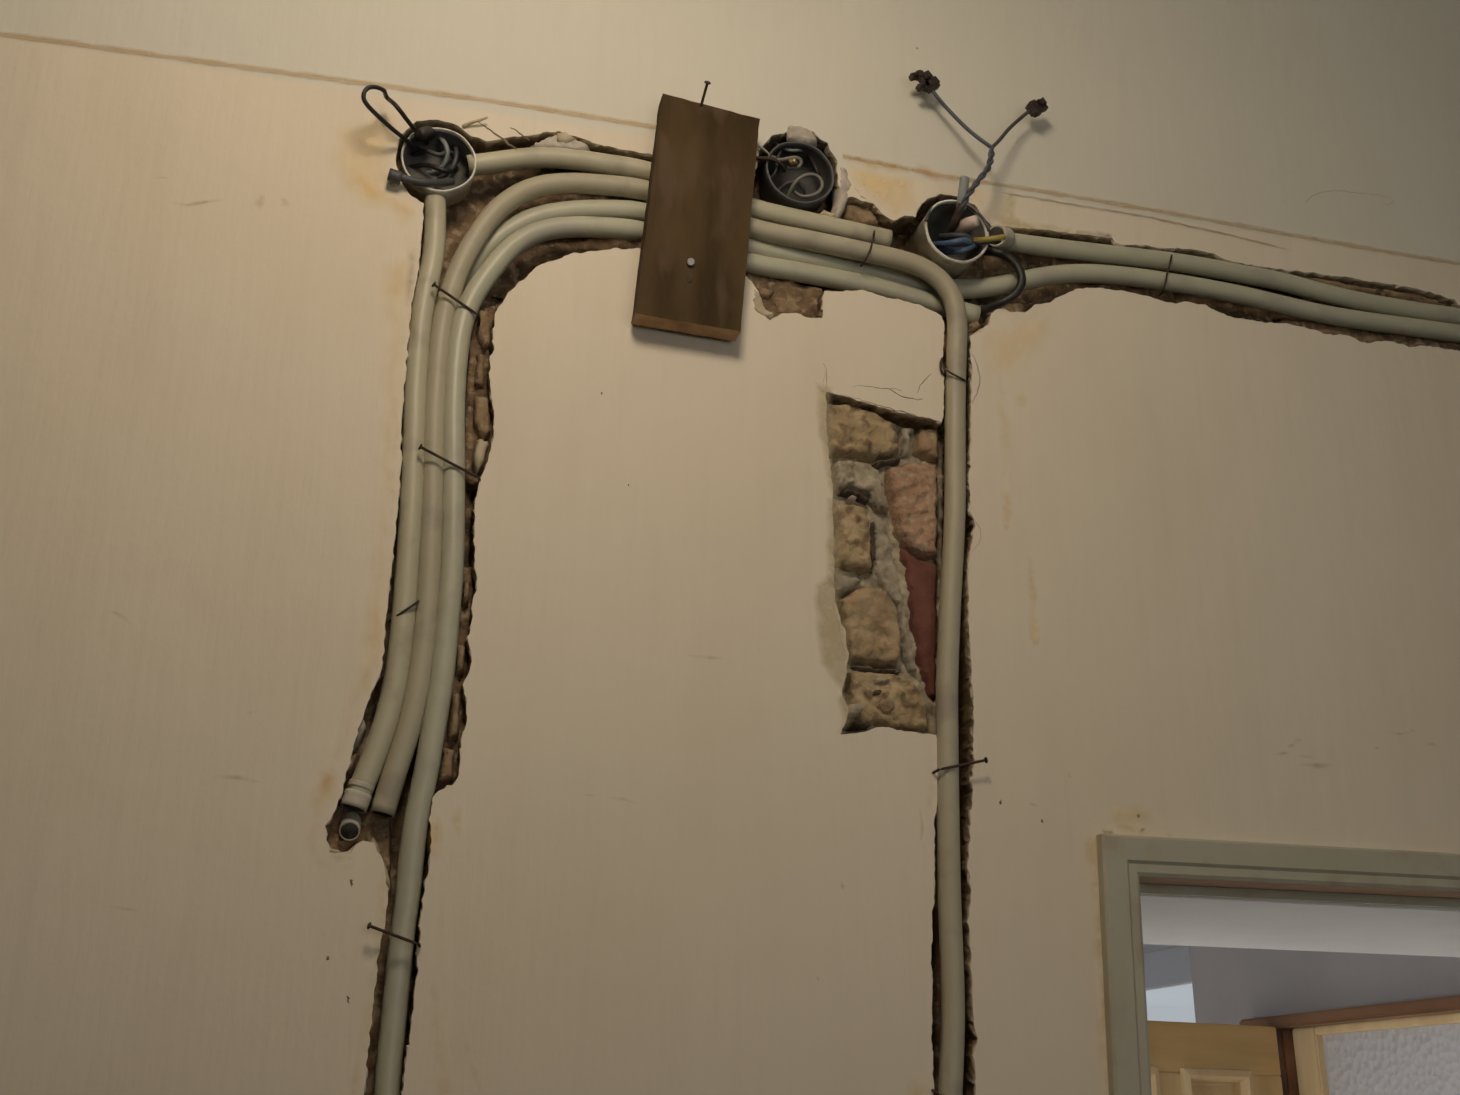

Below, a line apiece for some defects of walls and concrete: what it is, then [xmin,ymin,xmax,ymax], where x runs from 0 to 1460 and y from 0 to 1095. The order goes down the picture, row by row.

flaking render [465,305,497,496]
flaking render [746,273,823,320]
flaking render [1272,318,1460,351]
flaking render [1307,277,1448,306]
flaking render [820,401,944,735]
flaking render [434,567,474,795]
flaking render [326,685,392,890]